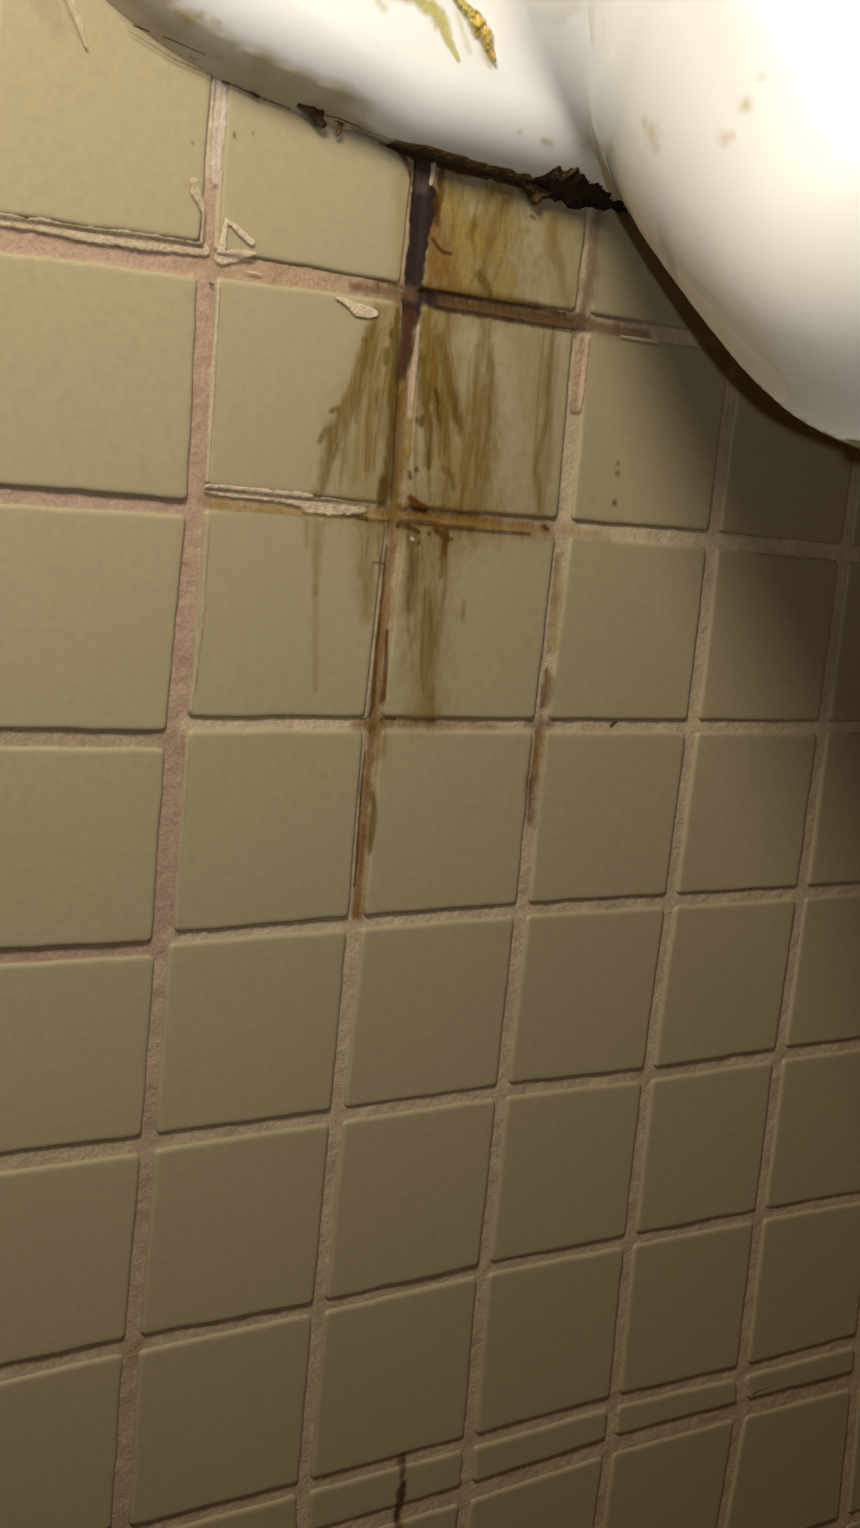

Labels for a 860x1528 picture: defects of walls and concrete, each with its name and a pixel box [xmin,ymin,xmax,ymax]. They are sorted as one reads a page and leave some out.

peeling [0,170,263,275]
peeling [203,285,367,515]
corrosion [424,170,516,303]
damp [351,160,649,521]
corrosion [211,308,549,917]